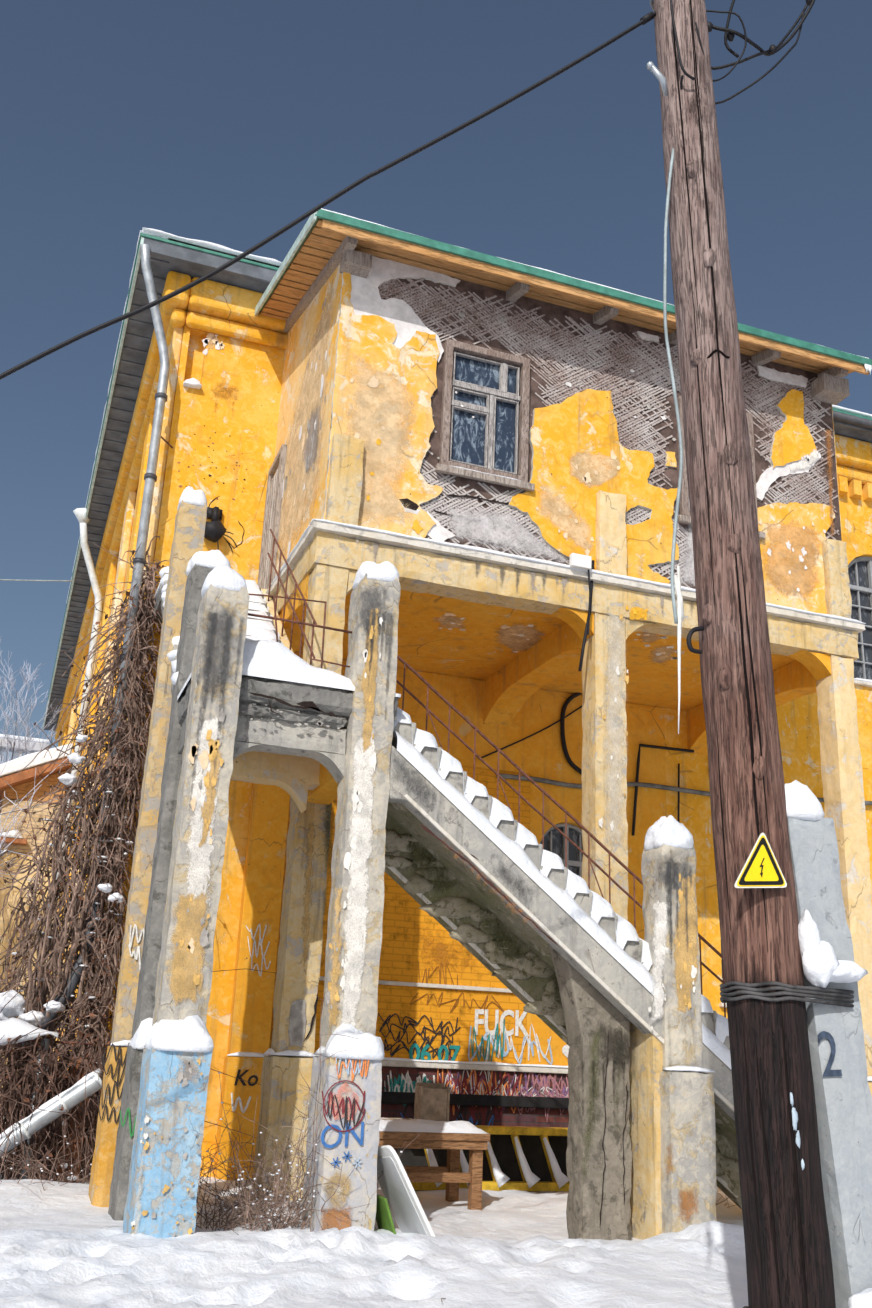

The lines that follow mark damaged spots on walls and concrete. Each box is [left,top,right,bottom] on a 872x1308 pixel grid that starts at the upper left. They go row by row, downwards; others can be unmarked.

flaking render [279,256,695,589]
flaking render [740,353,842,599]
damp [192,613,243,775]
peeling [166,702,347,1005]
damp [366,610,393,691]
spalling [288,609,566,1047]
peeling [598,606,685,842]
damp [666,863,692,944]
damp [582,1025,634,1151]
spalling [716,1132,742,1209]